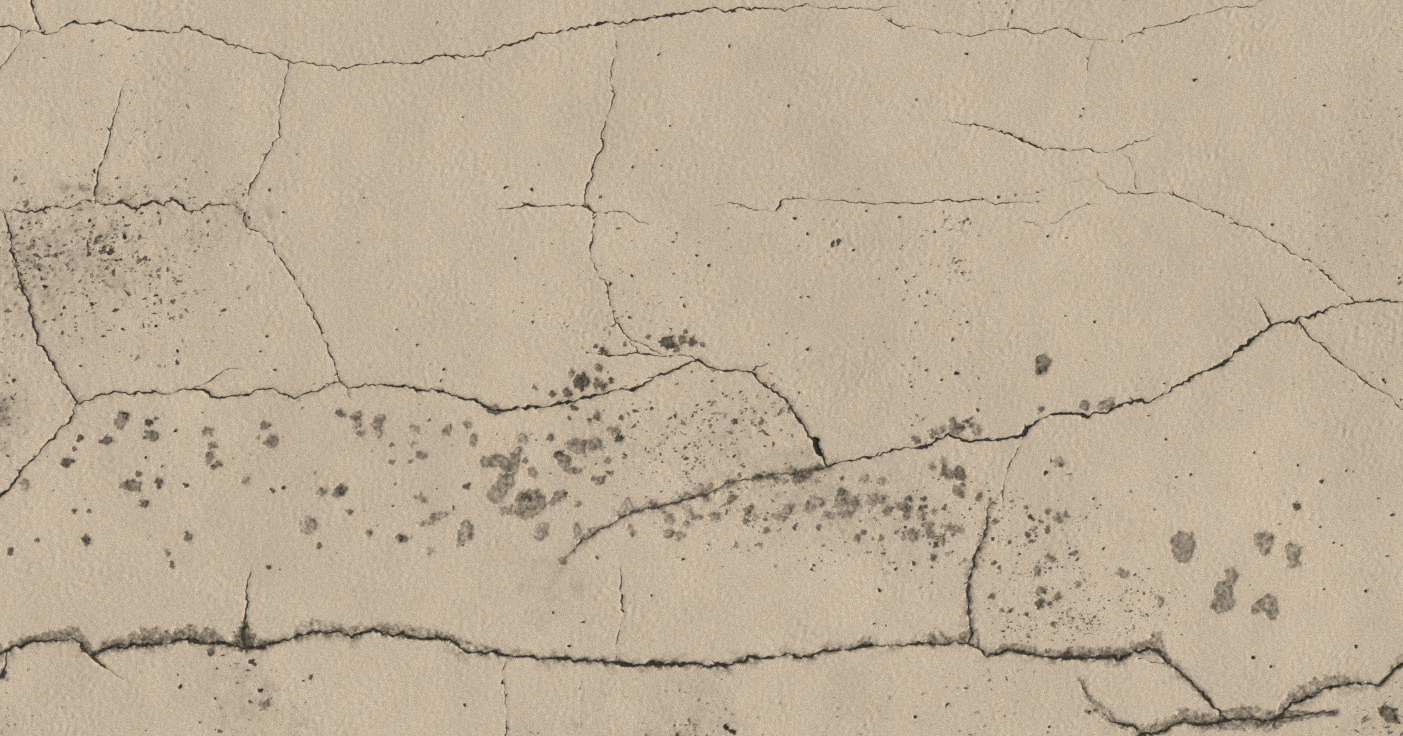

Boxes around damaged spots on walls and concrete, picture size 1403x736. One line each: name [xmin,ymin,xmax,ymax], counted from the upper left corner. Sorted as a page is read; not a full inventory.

crack [0,0,1403,556]
crack [0,505,1403,736]